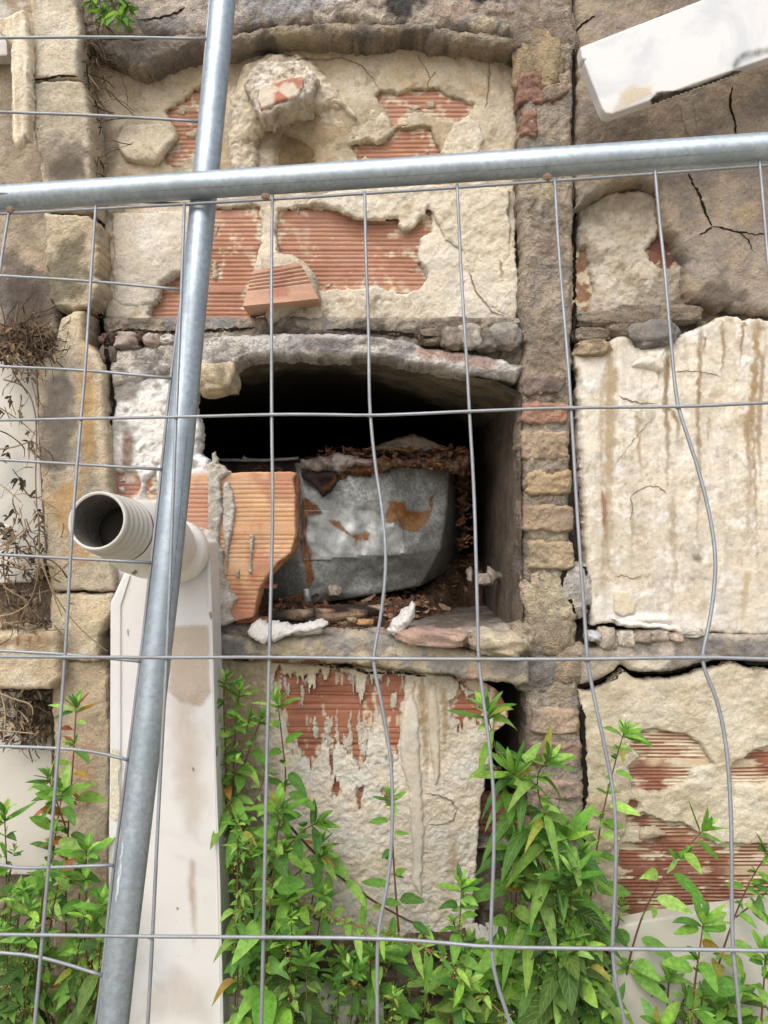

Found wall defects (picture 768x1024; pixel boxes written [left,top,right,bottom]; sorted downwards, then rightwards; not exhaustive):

spalling [230,53,342,157]
flaking render [351,88,473,160]
crack [729,85,737,134]
flaking render [206,207,432,326]
crack [570,185,578,341]
crack [688,173,764,250]
damp [603,354,616,530]
damp [663,355,679,434]
damp [740,323,765,462]
flaking render [247,655,420,796]
crack [579,660,768,830]
flaking render [617,729,768,916]